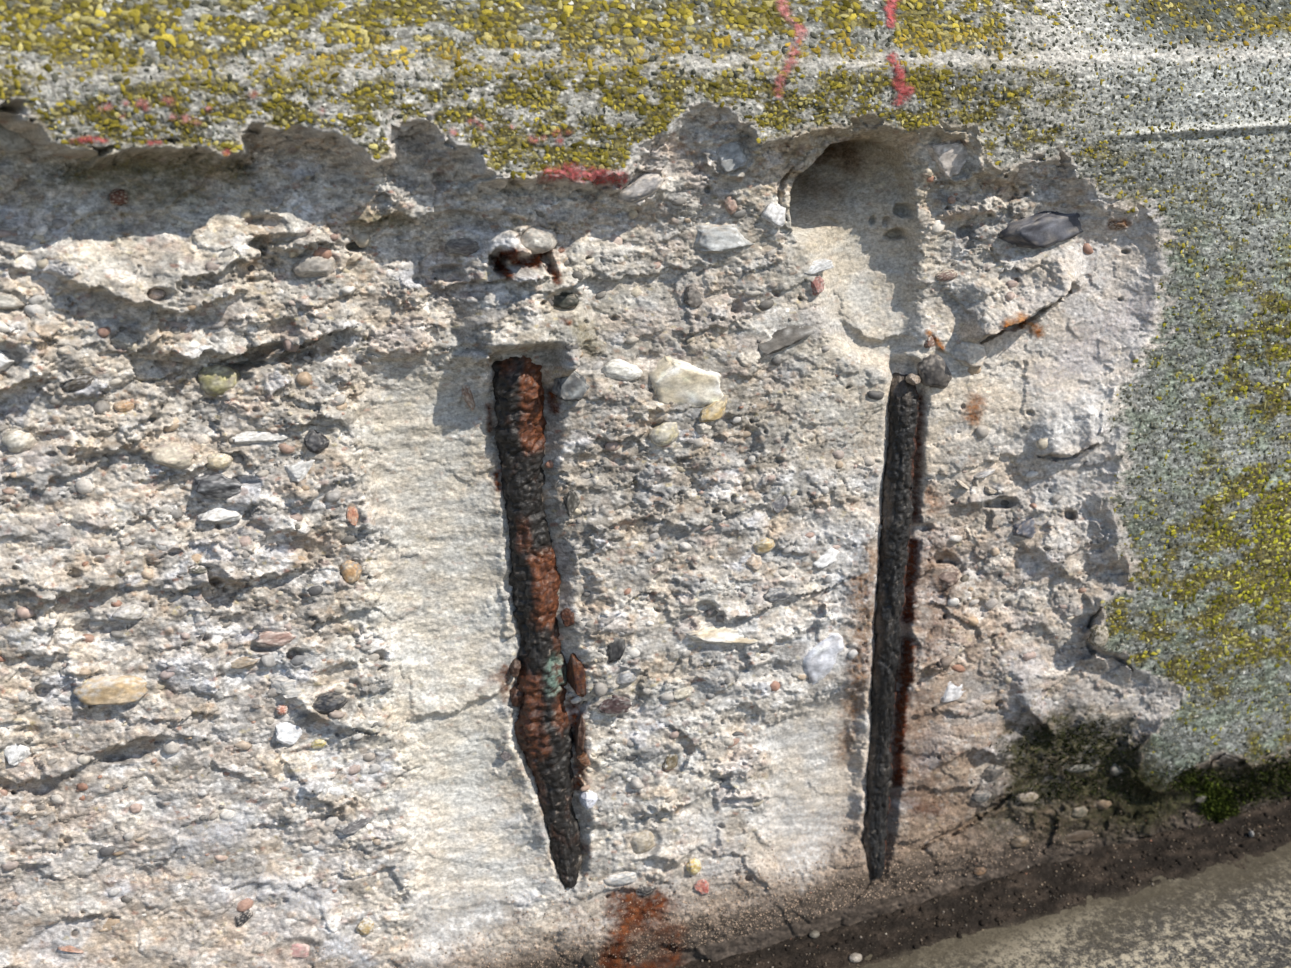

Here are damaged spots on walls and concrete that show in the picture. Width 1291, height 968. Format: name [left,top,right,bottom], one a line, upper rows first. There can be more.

corrosion [494,249,561,284]
corrosion [905,373,931,519]
spalling [289,655,304,666]
corrosion [501,657,524,707]
spalling [513,617,521,655]
spalling [593,682,608,697]
corrosion [892,539,943,786]
corrosion [567,653,591,791]
spalling [626,777,644,789]
spalling [857,790,867,833]
water stain [990,753,1291,829]
corrosion [600,889,680,968]